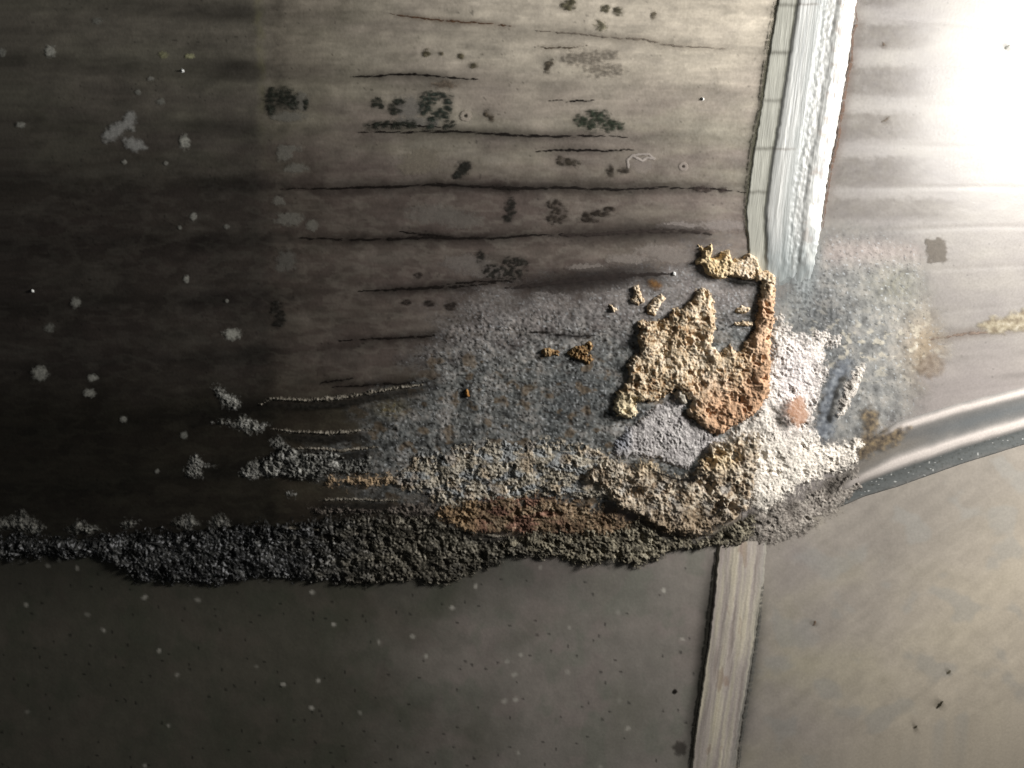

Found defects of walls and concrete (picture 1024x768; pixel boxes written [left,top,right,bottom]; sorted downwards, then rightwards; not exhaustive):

leakage [365,81,455,130]
crack [289,3,777,228]
leakage [103,112,147,164]
crack [301,231,563,241]
crack [358,280,513,292]
crack [532,330,595,338]
leakage [211,387,285,449]
peeling [260,384,423,409]
rust [0,233,941,589]
peeling [276,429,378,460]
leakage [186,455,210,478]
peeling [454,527,508,545]